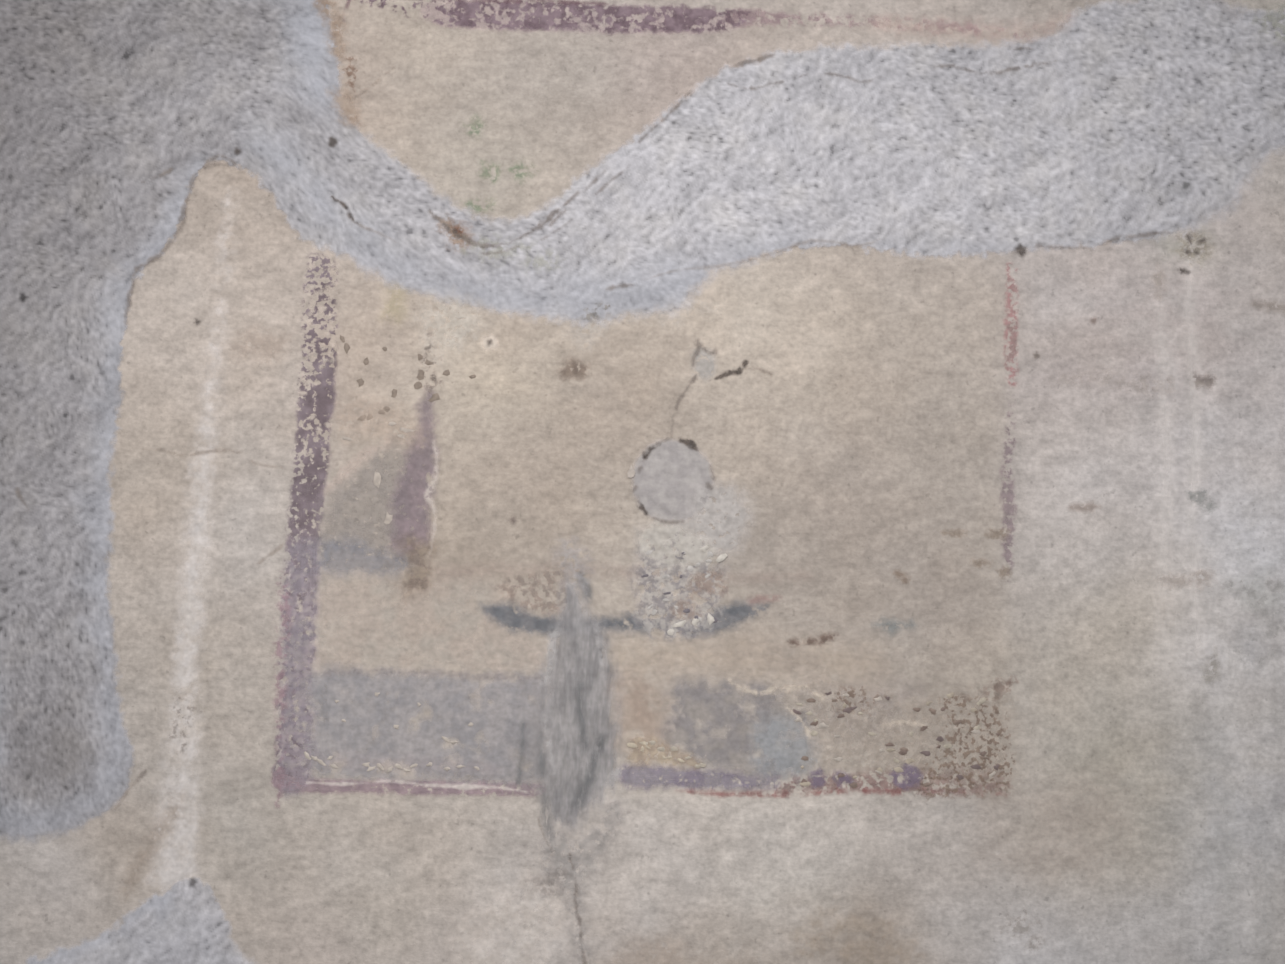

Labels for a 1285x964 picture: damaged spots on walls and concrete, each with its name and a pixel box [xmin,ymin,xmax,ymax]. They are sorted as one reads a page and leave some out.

peeling [414,354,450,402]
spalling [639,526,727,637]
peeling [747,687,890,738]
peeling [868,692,1014,795]
peeling [800,756,857,789]